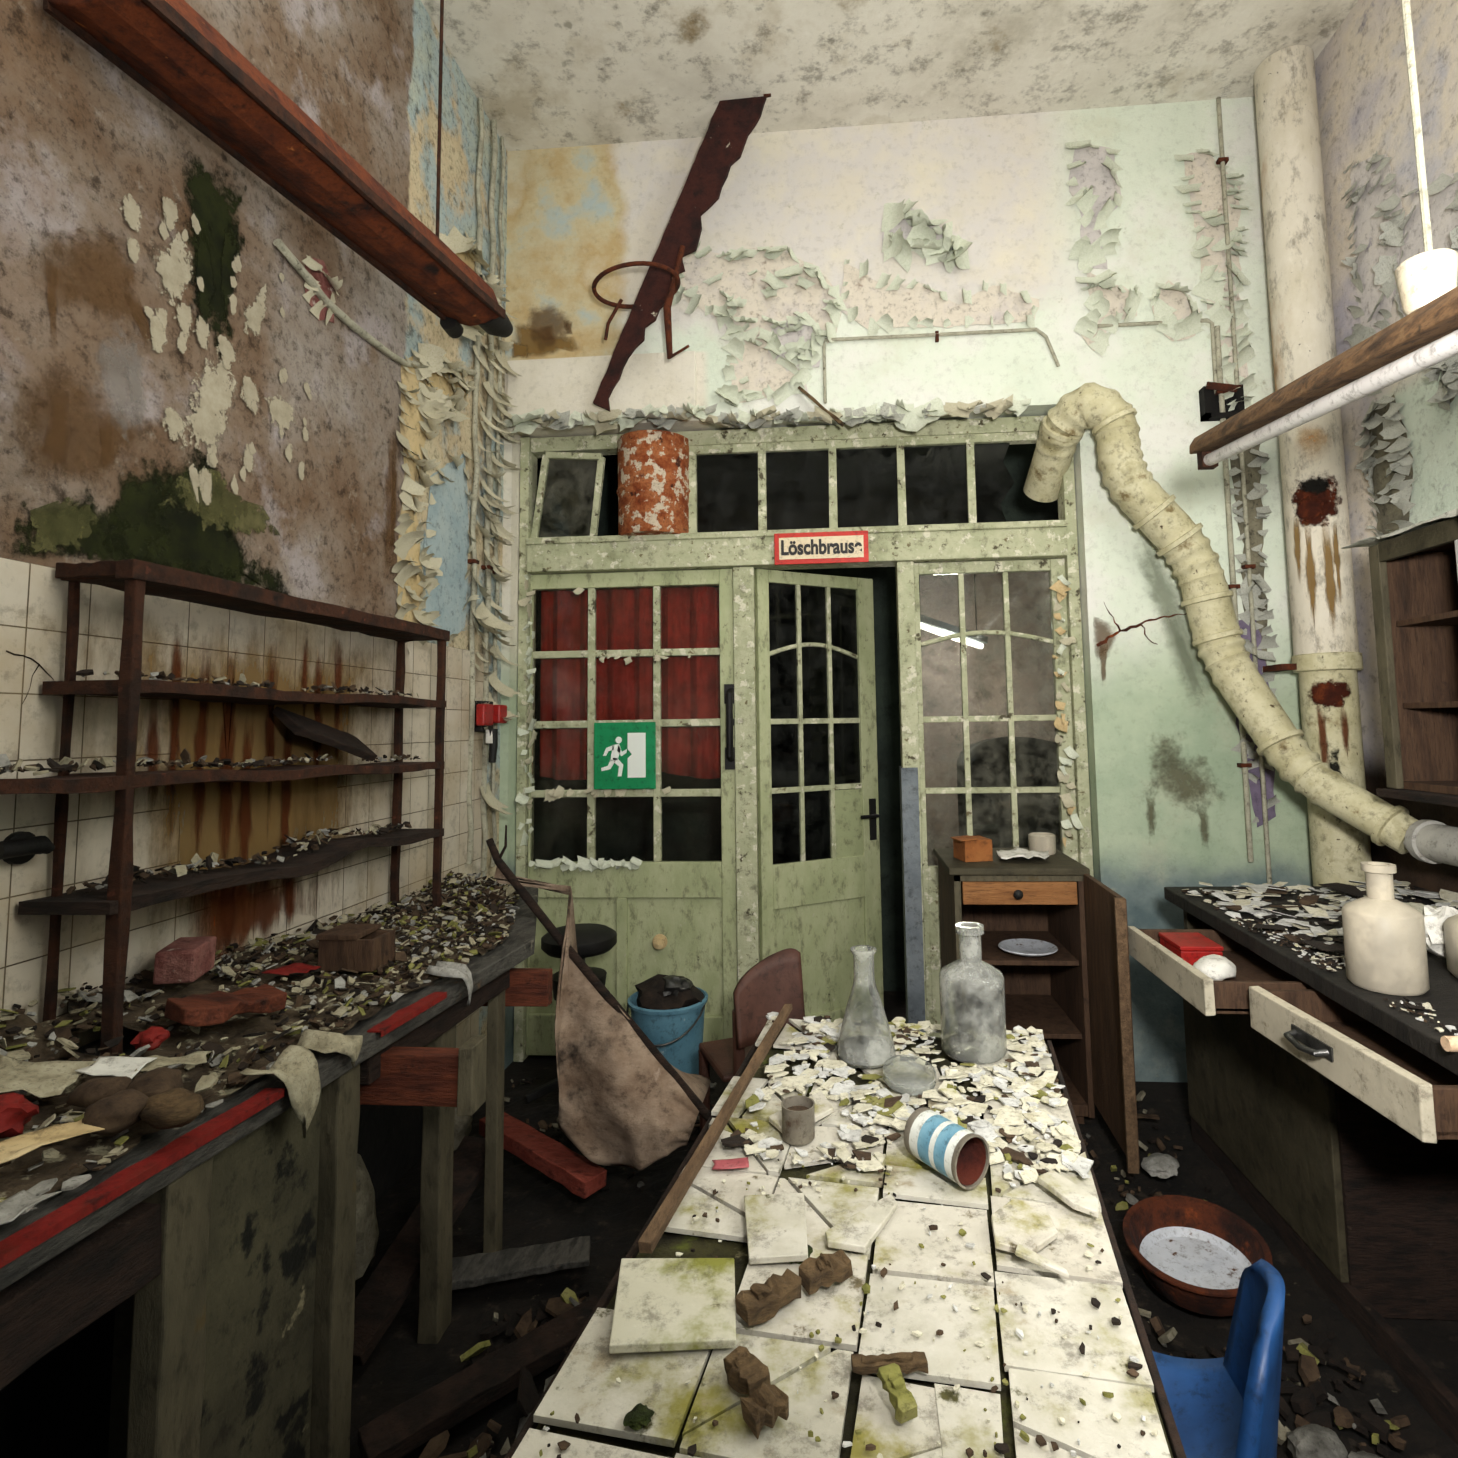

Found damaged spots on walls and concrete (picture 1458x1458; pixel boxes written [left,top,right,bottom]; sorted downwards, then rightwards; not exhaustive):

leakage [23,229,151,475]
peeling [118,193,312,505]
leakage [195,220,240,342]
leakage [513,309,576,357]
peeling [1065,140,1260,411]
peeling [1341,151,1458,347]
leakage [27,452,248,580]
peeling [392,198,1039,872]
rust [1291,475,1342,618]
rust [136,642,369,870]
rust [1308,679,1351,773]
rust [189,877,302,960]